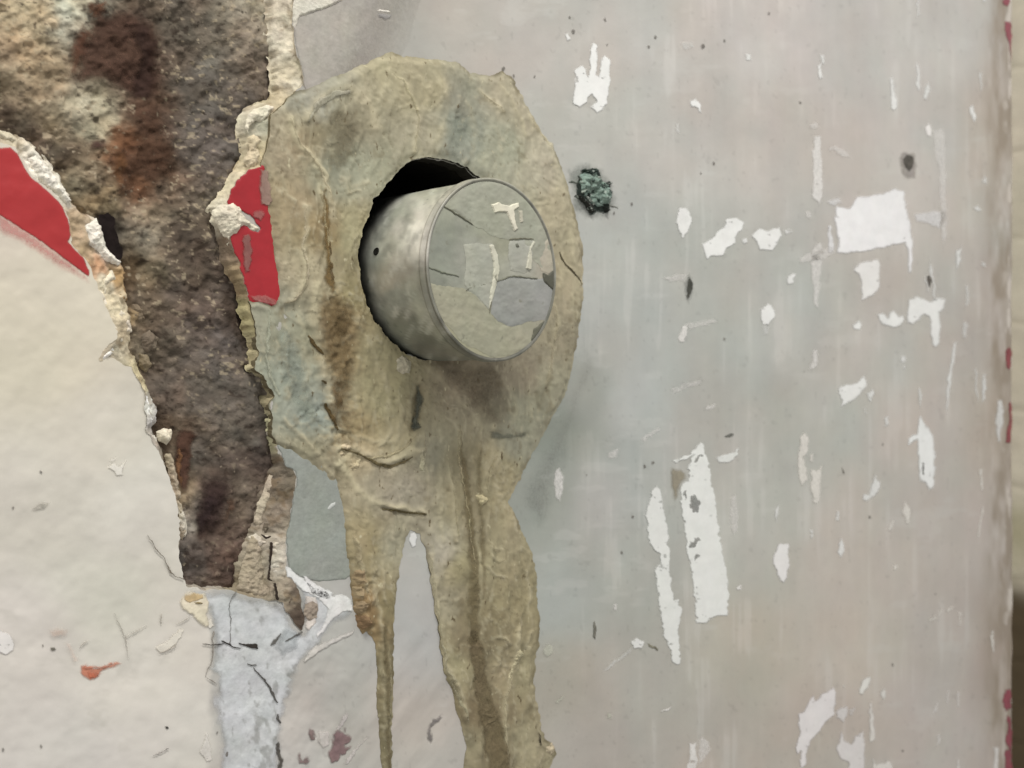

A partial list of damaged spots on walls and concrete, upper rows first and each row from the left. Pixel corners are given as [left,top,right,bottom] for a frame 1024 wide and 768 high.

corrosion [73,2,157,96]
peeling [573,43,611,113]
peeling [801,124,946,307]
peeling [878,266,945,346]
spalling [0,0,397,768]
peeling [908,416,936,490]
peeling [625,487,682,664]
peeling [674,443,741,623]
crack [206,591,303,723]
peeling [796,677,893,768]